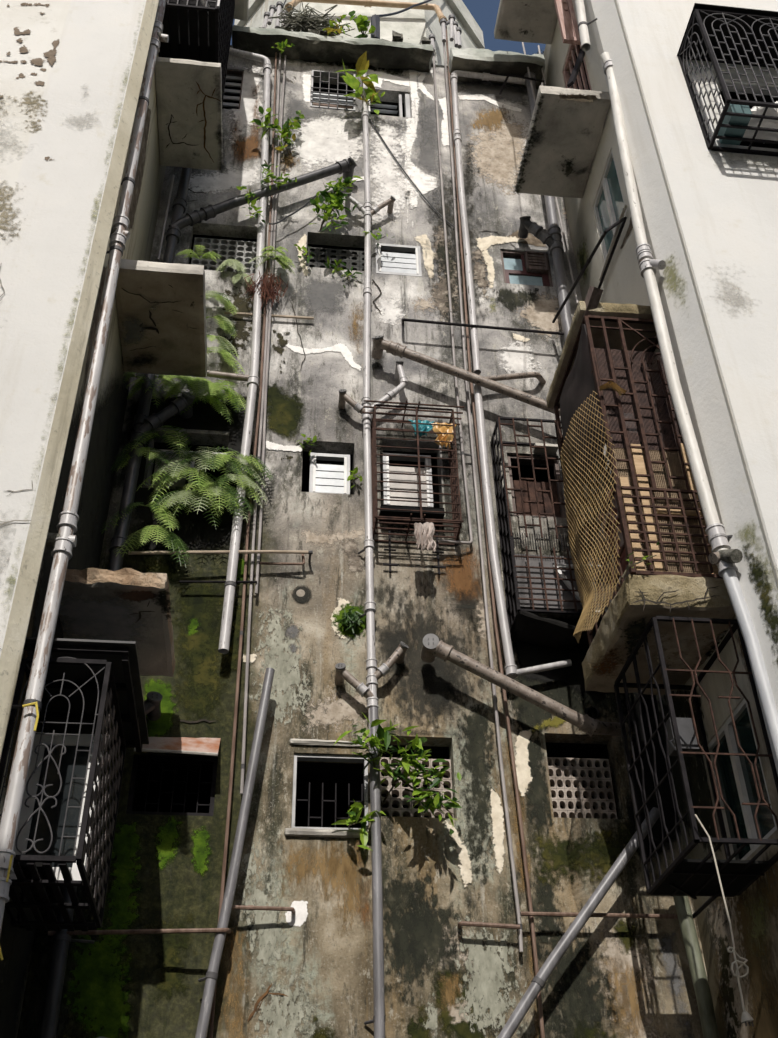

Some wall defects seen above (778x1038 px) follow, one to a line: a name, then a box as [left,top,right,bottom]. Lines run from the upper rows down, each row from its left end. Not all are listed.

peeling [0,27,59,86]
water stain [0,91,48,133]
crack [166,82,221,162]
water stain [0,183,20,239]
spalling [509,230,547,247]
crack [122,285,197,351]
water stain [743,543,778,662]
peeling [514,716,566,796]
water stain [500,626,721,863]
water stain [374,579,643,1038]